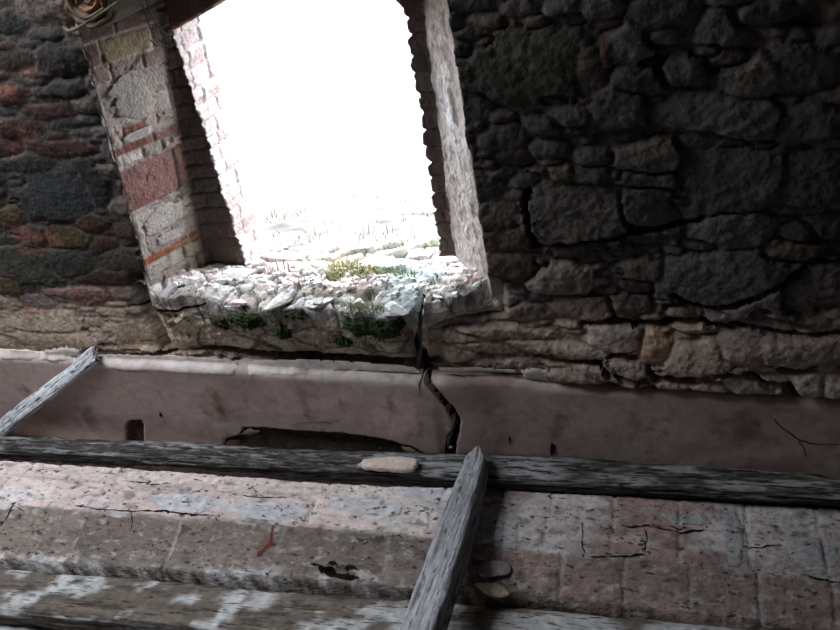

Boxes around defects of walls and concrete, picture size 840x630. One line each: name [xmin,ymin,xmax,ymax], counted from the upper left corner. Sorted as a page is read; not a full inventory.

crack [414,294,461,452]
spalling [223,427,423,453]
crack [62,503,207,531]
crack [581,524,705,557]
crack [803,574,840,583]